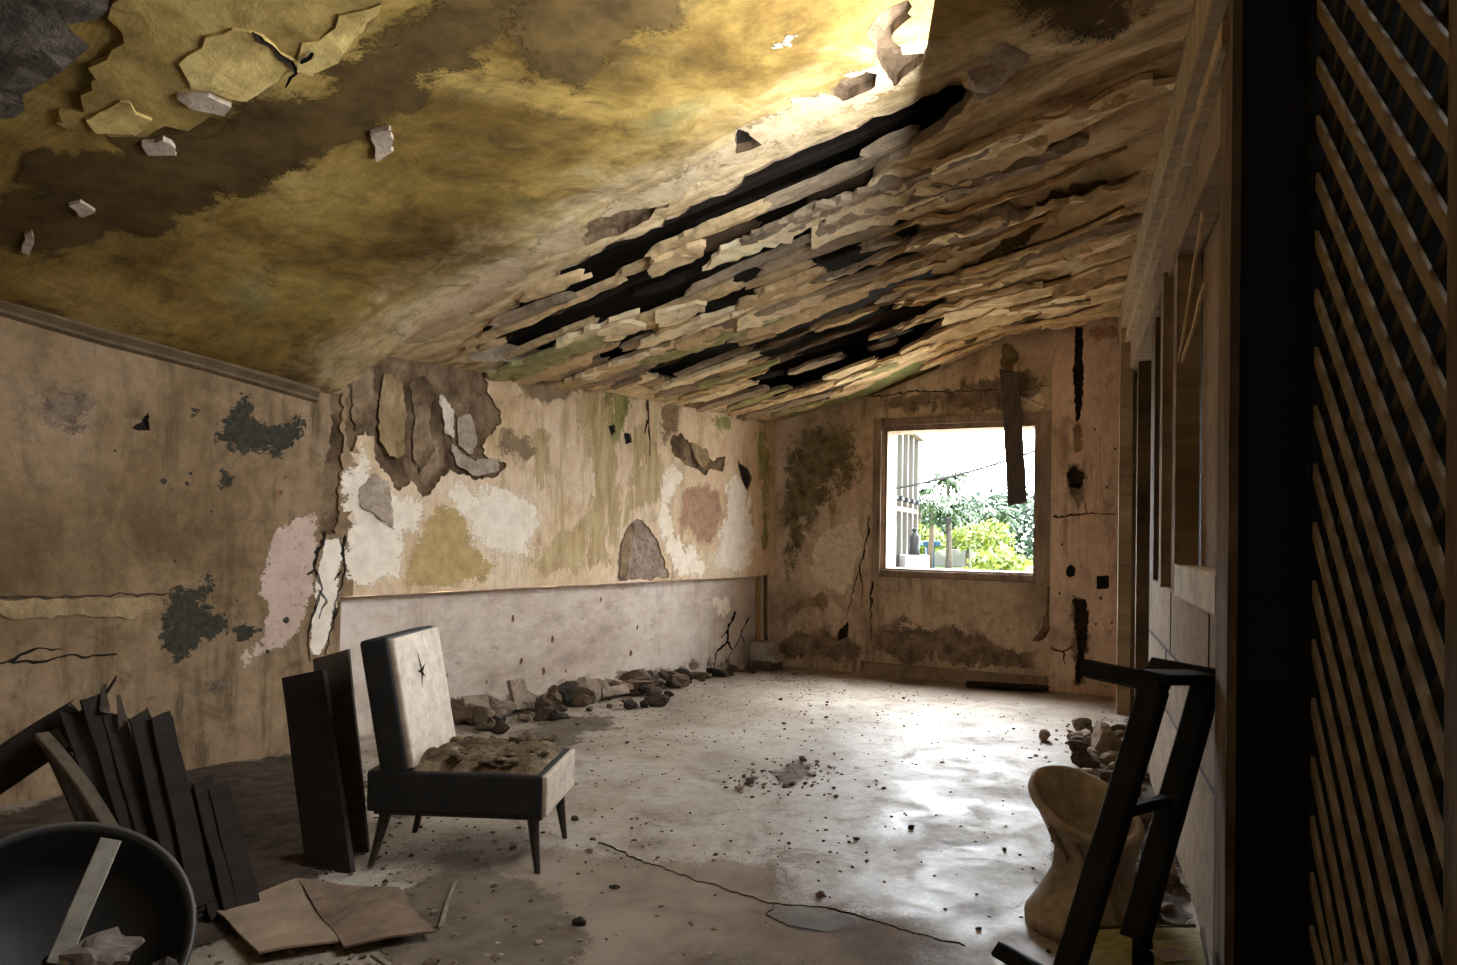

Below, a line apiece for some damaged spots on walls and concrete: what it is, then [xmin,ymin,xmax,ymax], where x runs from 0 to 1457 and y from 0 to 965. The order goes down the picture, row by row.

flaking render [0,0,389,156]
flaking render [830,0,924,101]
flaking render [682,73,1177,371]
water stain [961,179,1108,269]
flaking render [240,356,545,668]
flaking render [617,433,756,619]
water stain [779,421,866,580]
crack [0,647,117,664]
crack [0,591,201,600]
crack [307,531,347,661]
water stain [777,591,1041,672]
crack [598,842,965,947]